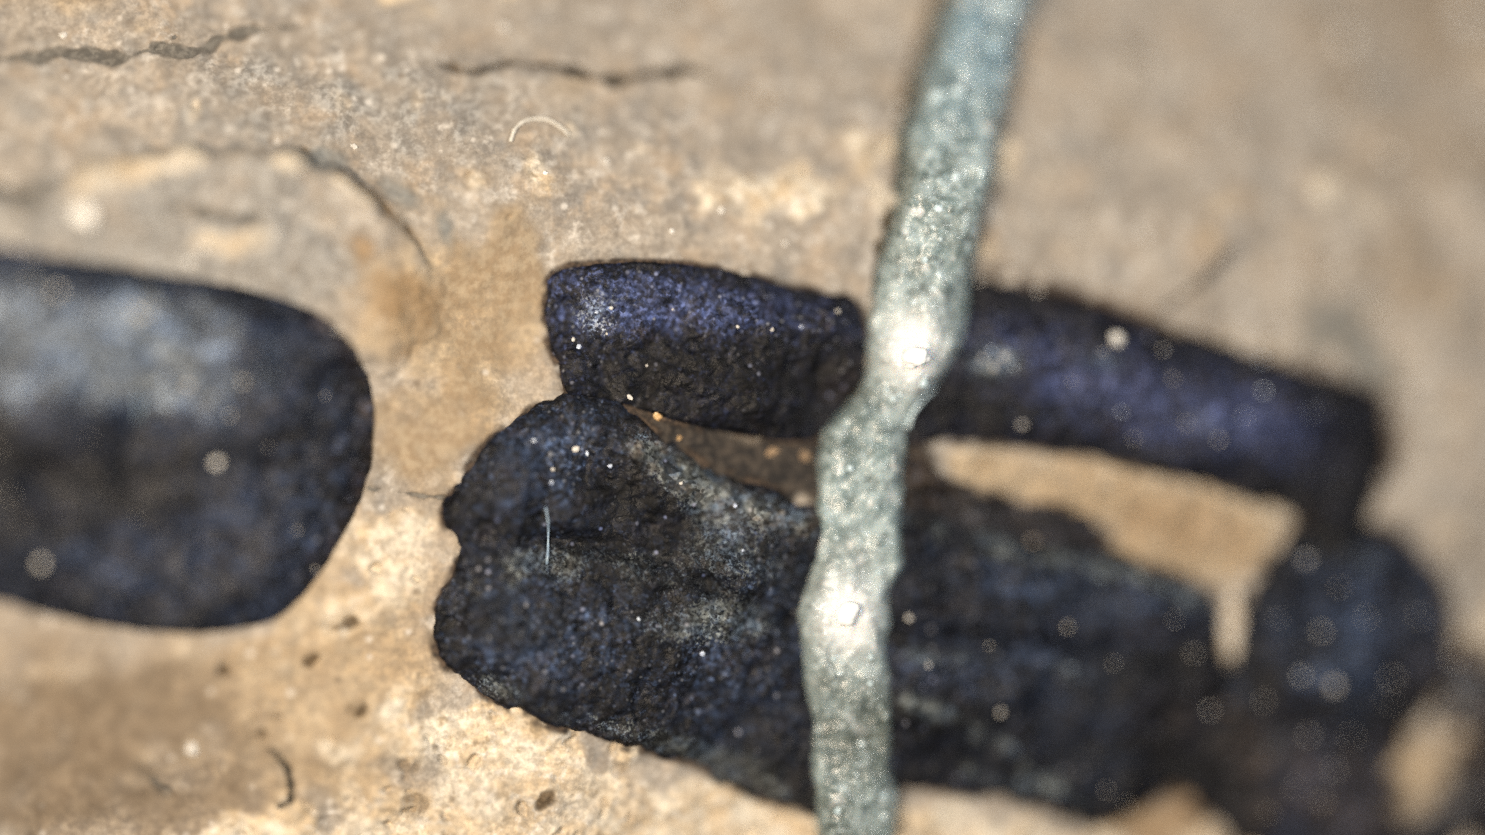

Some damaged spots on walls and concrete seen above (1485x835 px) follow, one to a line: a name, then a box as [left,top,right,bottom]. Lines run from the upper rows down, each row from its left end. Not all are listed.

crack [871,0,944,297]